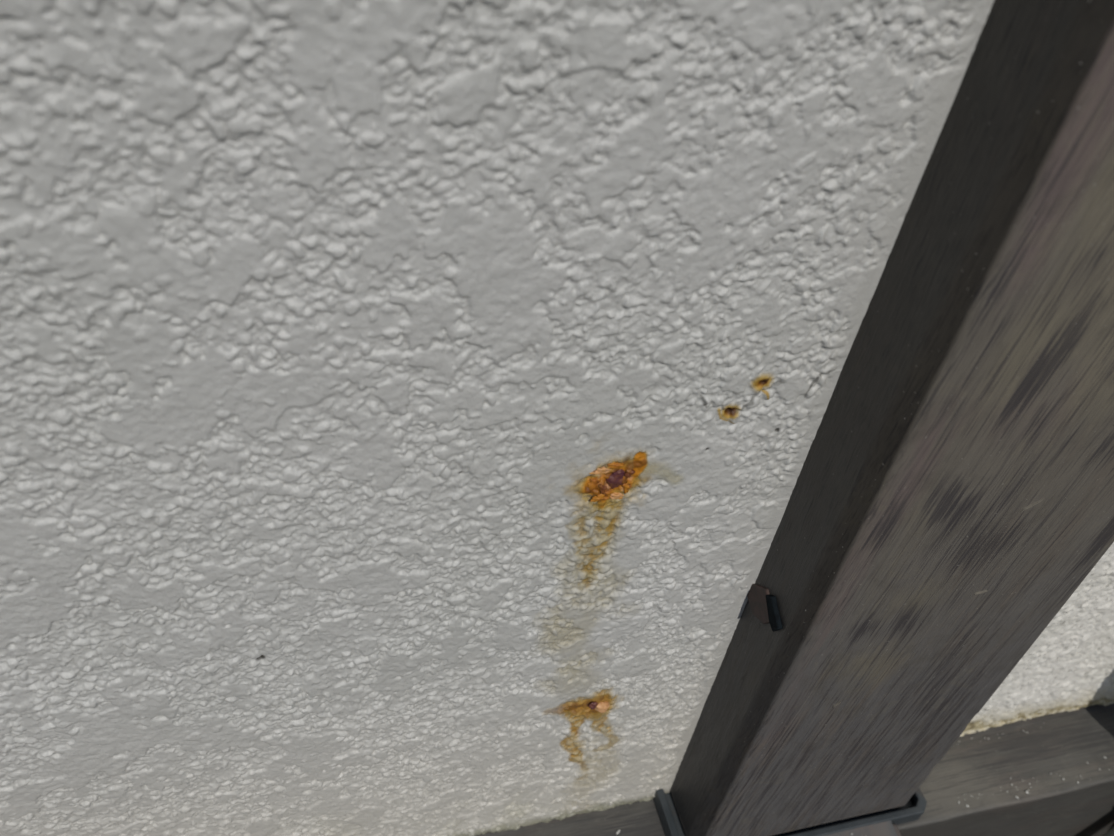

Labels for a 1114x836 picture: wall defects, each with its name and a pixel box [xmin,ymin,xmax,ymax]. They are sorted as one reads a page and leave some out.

corrosion [718,406,738,424]
corrosion [753,376,772,400]
corrosion [576,452,647,583]
corrosion [561,690,615,762]